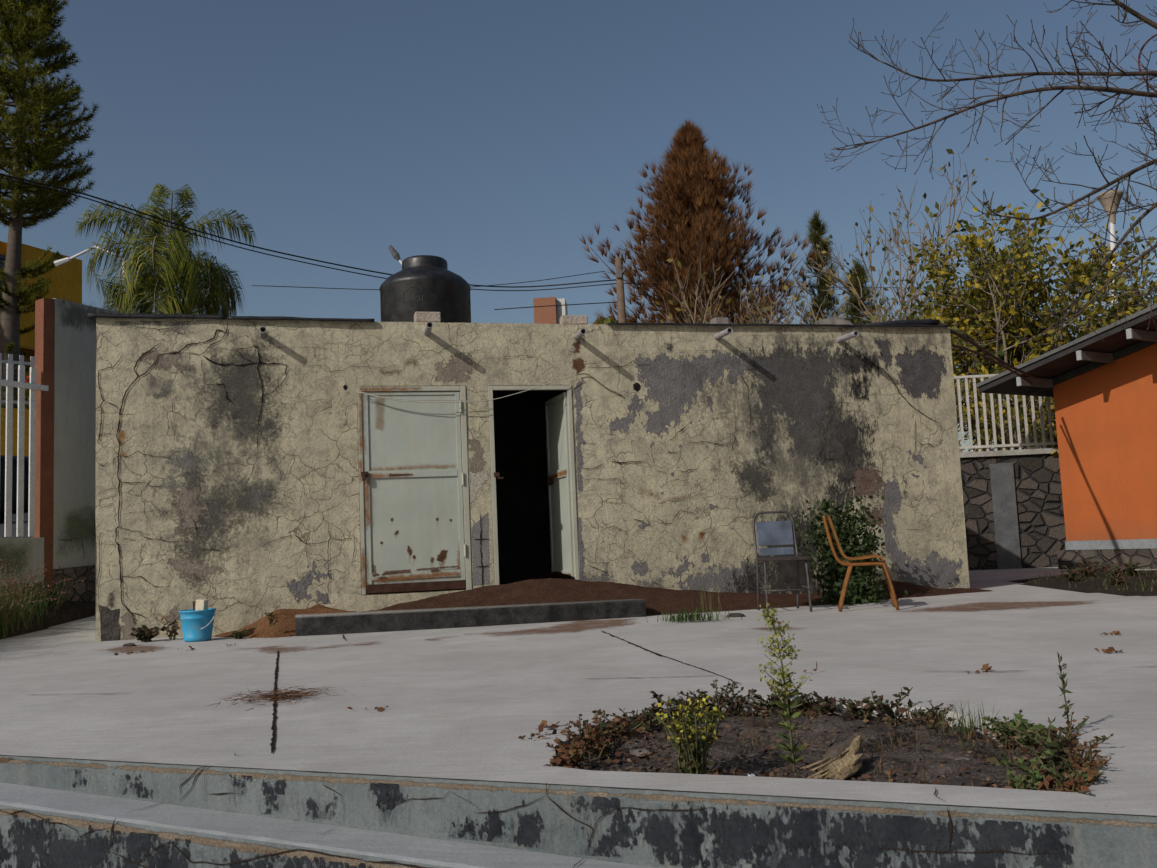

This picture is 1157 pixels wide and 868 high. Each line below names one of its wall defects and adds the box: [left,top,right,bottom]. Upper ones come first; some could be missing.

peeling [434,352,473,384]
crack [65,322,534,622]
corrosion [359,387,453,525]
crack [580,335,809,524]
leakage [726,336,891,594]
crack [852,363,941,530]
peeling [286,561,332,604]
corrosion [361,546,460,587]
leakage [0,814,190,868]
leakage [230,775,286,814]
leakage [452,799,544,848]
leakage [570,796,1074,868]